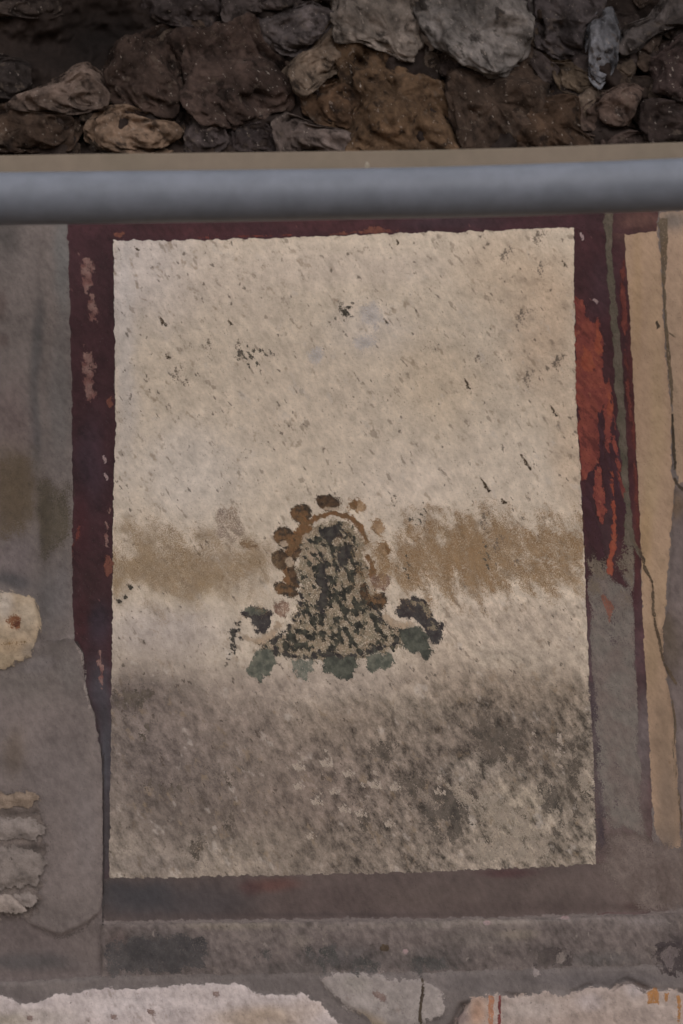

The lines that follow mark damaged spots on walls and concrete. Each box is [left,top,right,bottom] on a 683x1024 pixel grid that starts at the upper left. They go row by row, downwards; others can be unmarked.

damp [112,503,292,634]
damp [328,213,683,914]
spalling [0,790,49,921]